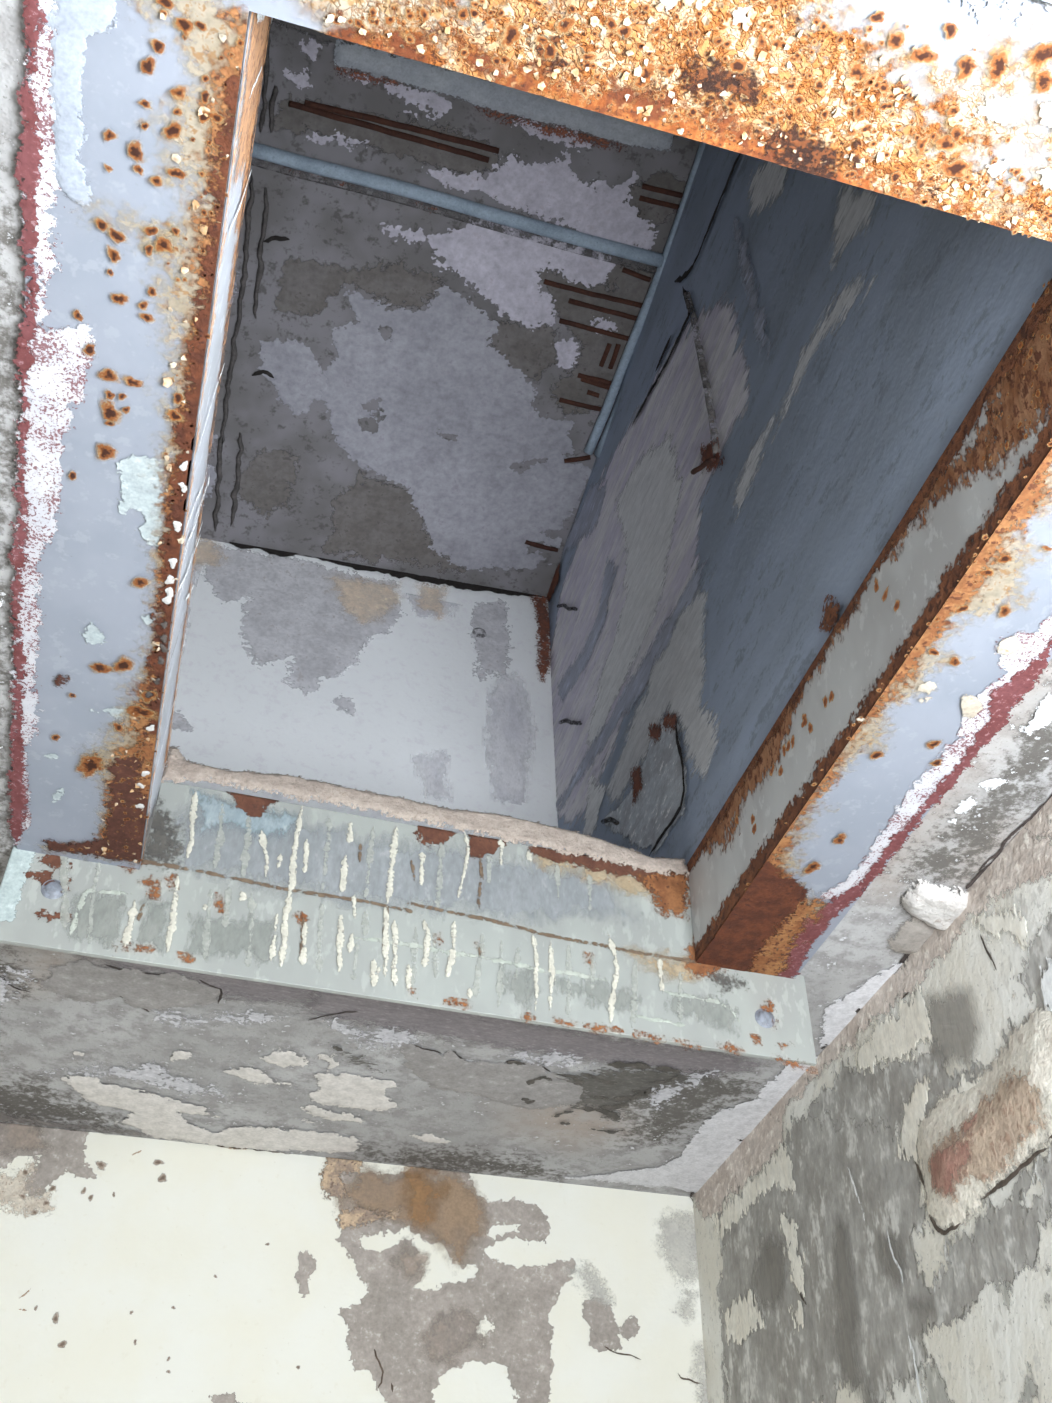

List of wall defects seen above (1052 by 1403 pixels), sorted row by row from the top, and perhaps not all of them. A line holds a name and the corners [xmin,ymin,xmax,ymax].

peeling [201,33,687,694]
peeling [0,0,119,846]
rust [23,0,1052,981]
damp [333,577,451,623]
damp [0,966,36,1005]
damp [39,1059,234,1099]
rust [443,997,469,1011]
rust [554,1019,701,1050]
rust [720,1033,818,1074]
peeling [554,797,1052,1403]
peeling [61,1042,588,1403]
damp [340,1166,485,1264]